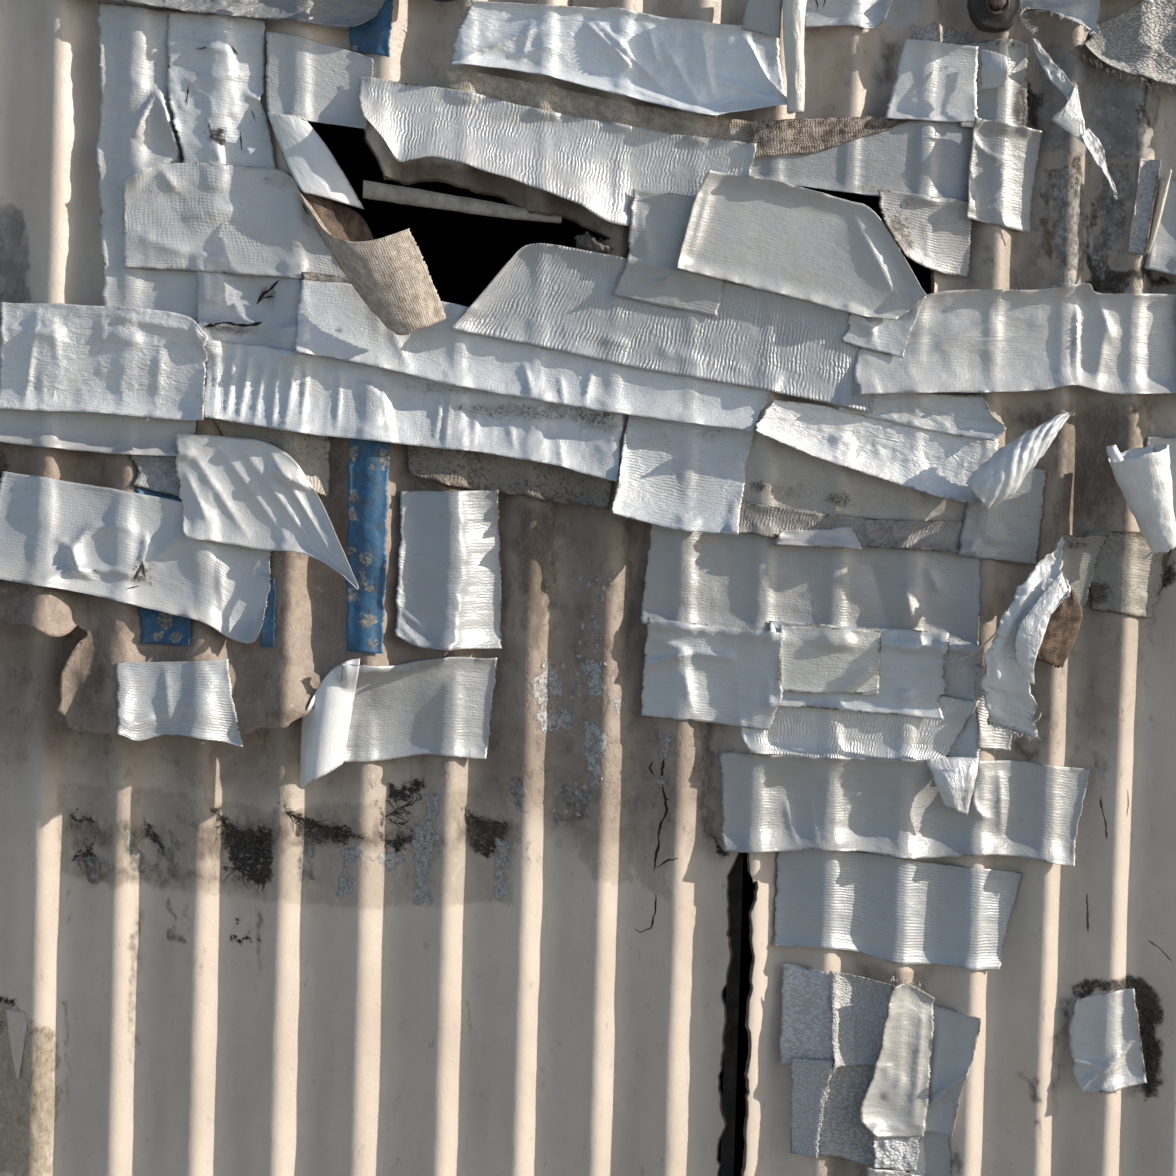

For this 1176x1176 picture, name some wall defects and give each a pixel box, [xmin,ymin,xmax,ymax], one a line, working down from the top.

damp [1026,83,1043,131]
damp [1070,155,1082,197]
damp [1087,237,1110,290]
damp [72,838,97,873]
damp [332,825,364,840]
damp [379,807,412,853]
crack [635,758,678,933]
damp [1140,1008,1160,1097]